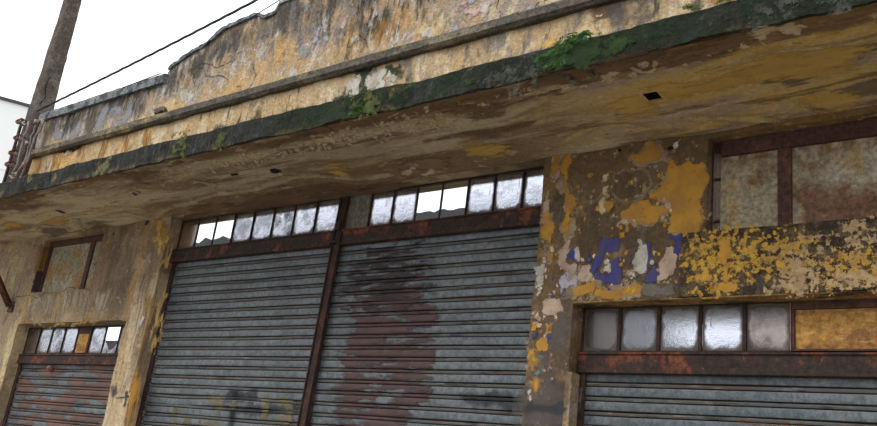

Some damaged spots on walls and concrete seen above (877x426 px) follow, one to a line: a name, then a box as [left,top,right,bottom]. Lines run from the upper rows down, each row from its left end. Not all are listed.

leakage [332,64,404,101]
leakage [29,91,143,160]
peeling [166,101,490,182]
peeling [524,139,877,400]